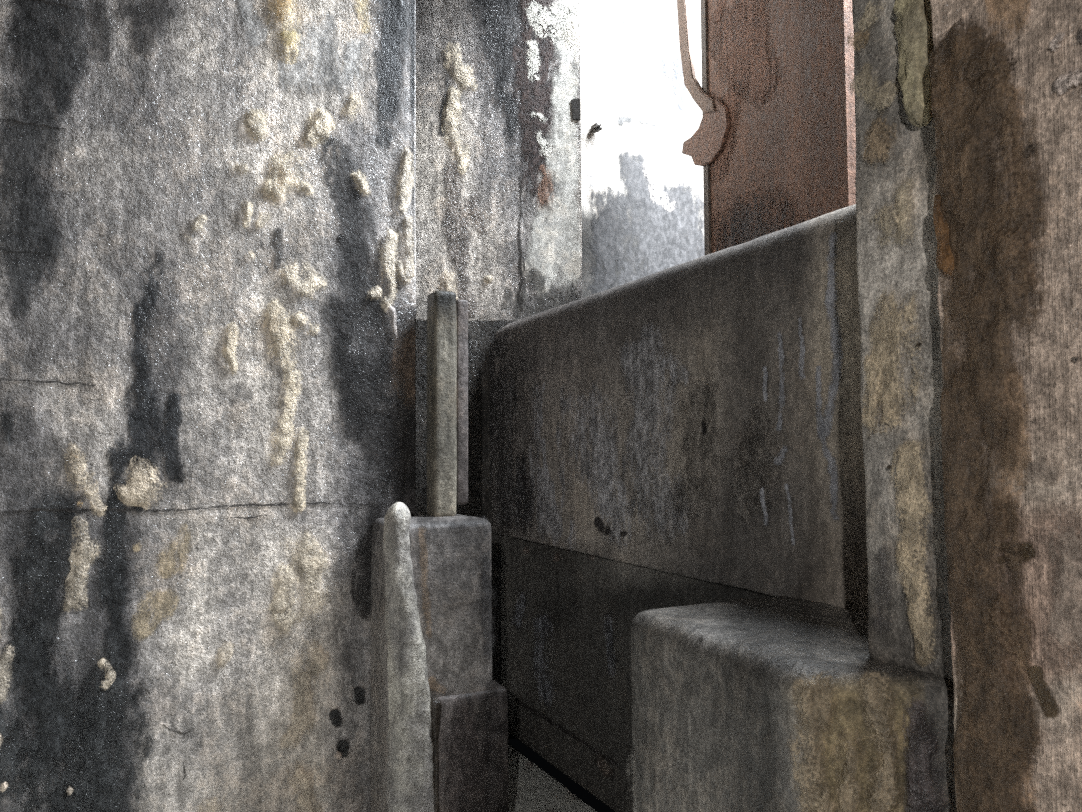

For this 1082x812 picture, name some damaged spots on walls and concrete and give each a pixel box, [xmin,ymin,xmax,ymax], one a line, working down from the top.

crack [0,119,65,129]
damp [0,0,176,317]
damp [239,0,415,513]
damp [439,43,487,319]
damp [471,0,578,157]
damp [618,152,705,269]
crack [0,378,96,386]
crack [1,502,394,519]
damp [269,531,330,634]
damp [418,326,722,637]
damp [836,20,1046,812]
damp [1049,526,1082,649]